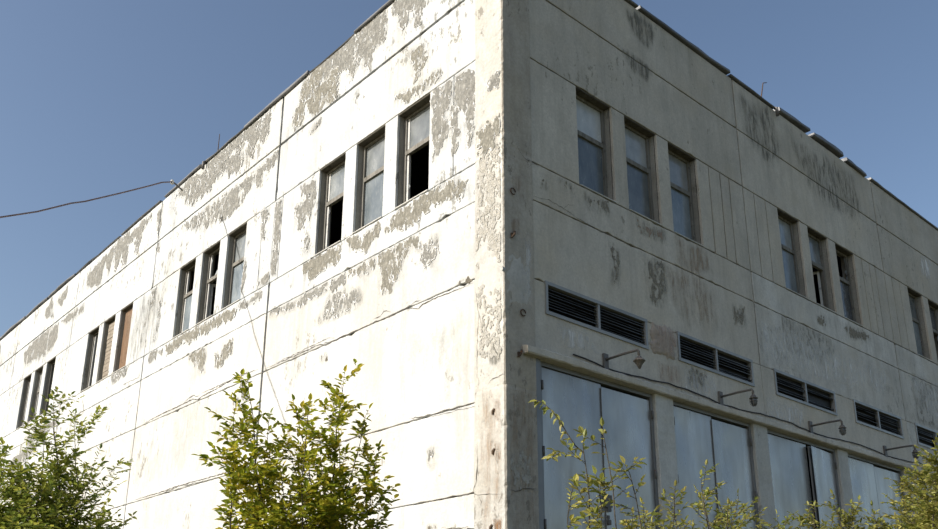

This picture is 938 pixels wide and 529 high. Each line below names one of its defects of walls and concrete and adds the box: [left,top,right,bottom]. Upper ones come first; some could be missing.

peeling [292,0,429,132]
peeling [175,109,279,231]
spalling [270,44,501,320]
peeling [24,286,84,364]
peeling [148,199,281,373]
crack [145,283,480,423]
spalling [458,276,501,359]
spalling [648,261,666,303]